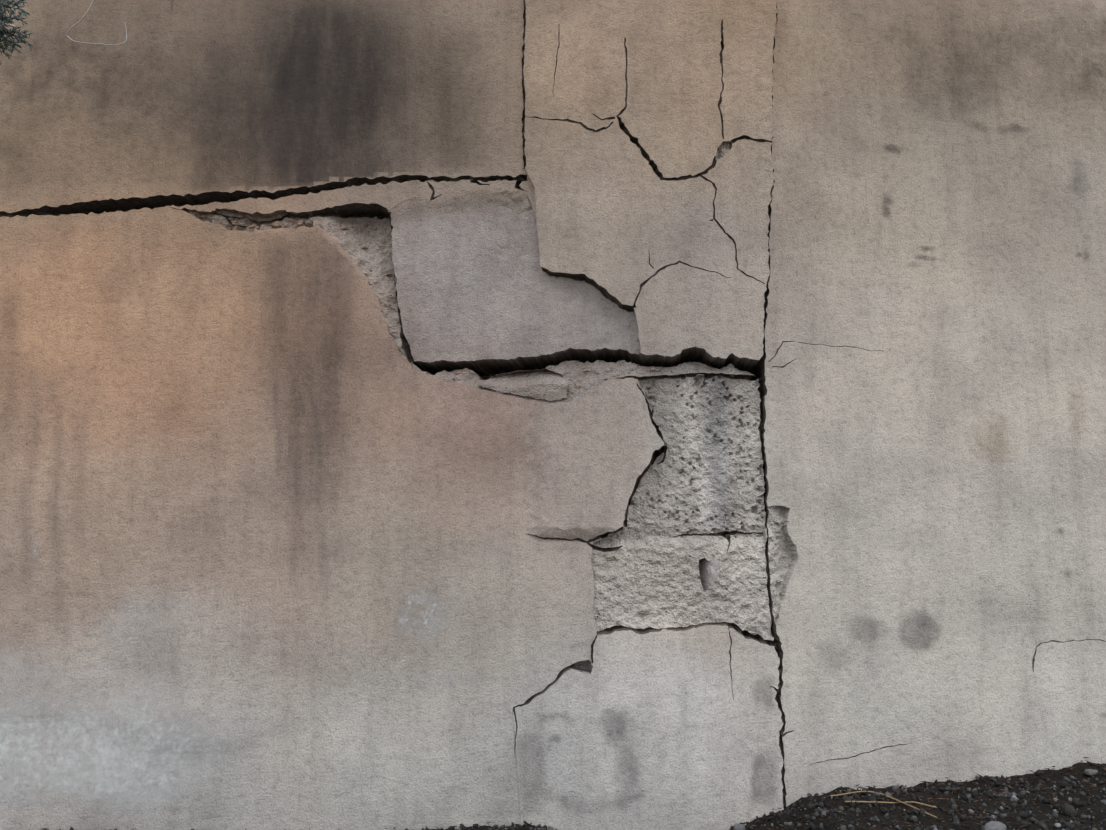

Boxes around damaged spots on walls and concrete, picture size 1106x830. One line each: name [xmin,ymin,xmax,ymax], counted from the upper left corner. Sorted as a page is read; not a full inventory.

flaking render [167,188,640,375]
crack [0,0,882,807]
flaking render [591,367,798,638]
crack [1032,639,1106,672]
crack [810,743,911,765]